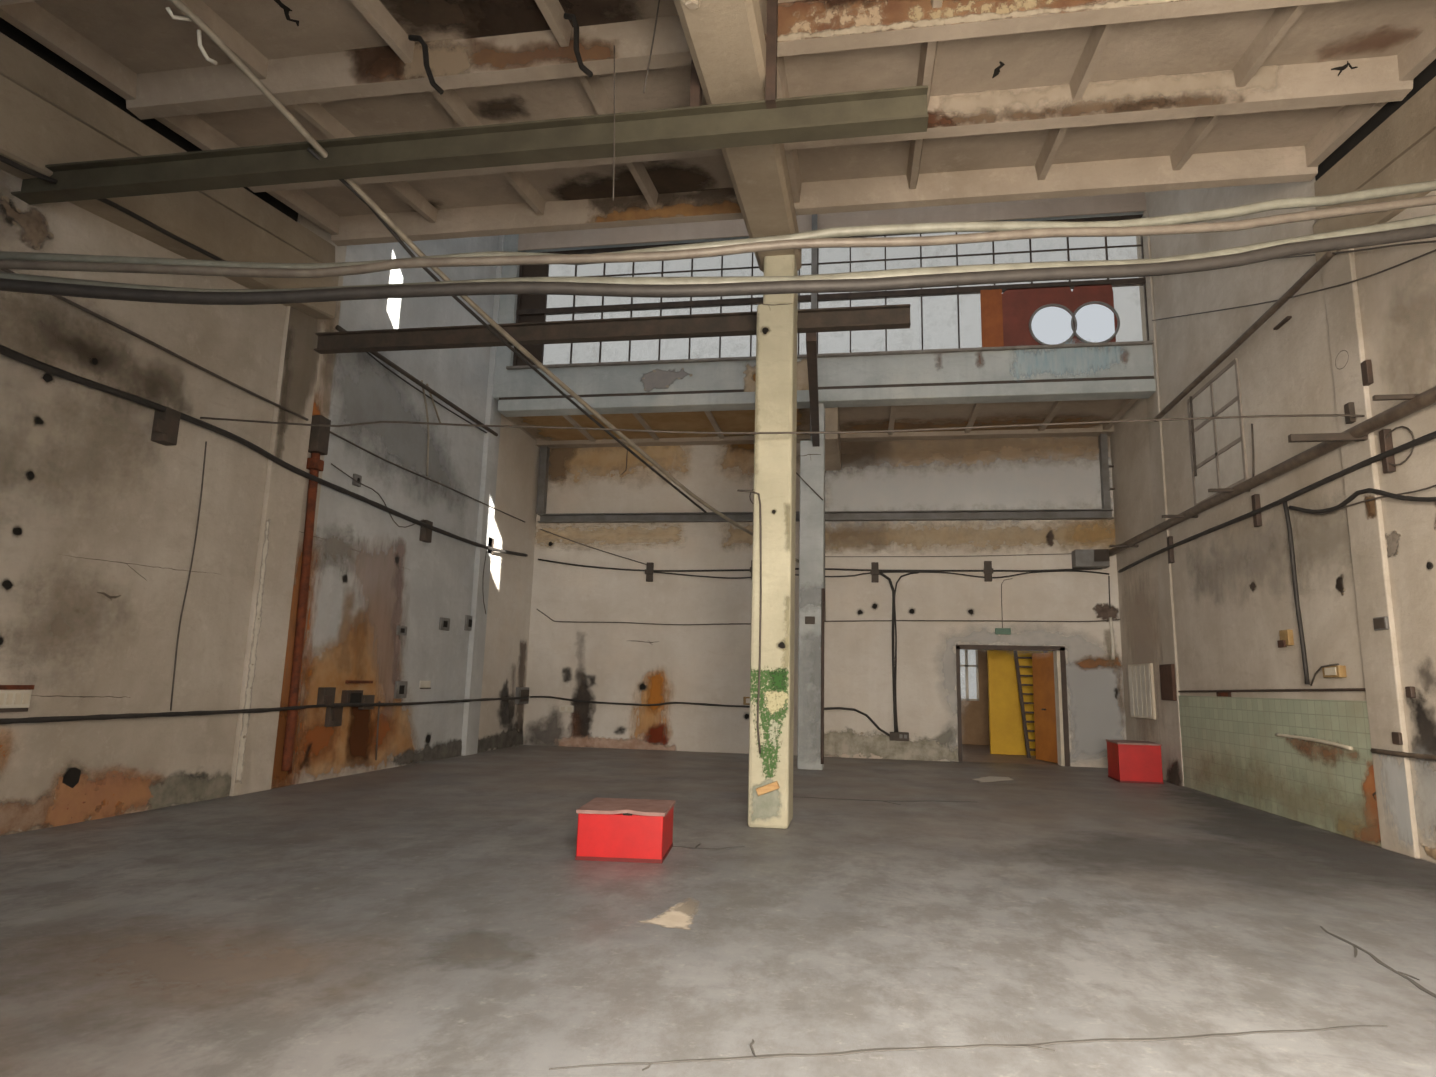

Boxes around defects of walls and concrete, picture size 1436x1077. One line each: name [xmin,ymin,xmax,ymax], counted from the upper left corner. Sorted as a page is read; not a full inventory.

spalling [778,0,1179,42]
flaking render [0,520,270,836]
rust [271,549,414,788]
crack [1320,926,1436,998]